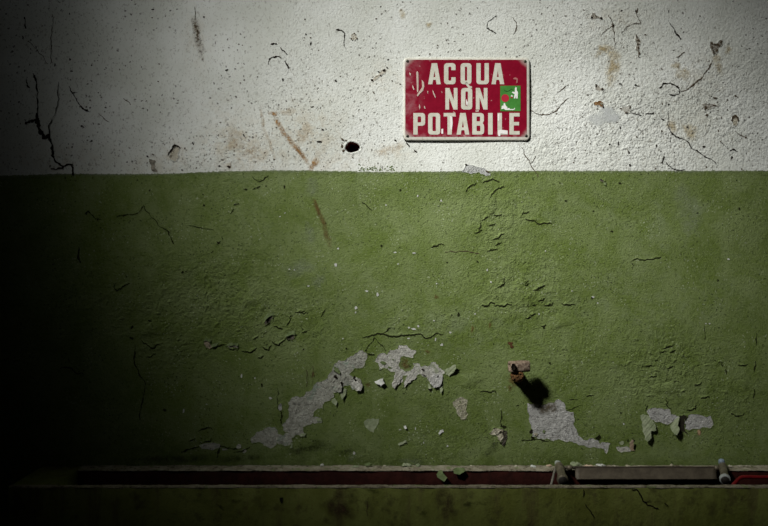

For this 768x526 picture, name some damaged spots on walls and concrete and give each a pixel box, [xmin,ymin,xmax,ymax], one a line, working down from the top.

crack [22,15,109,176]
crack [659,60,713,96]
crack [631,112,747,171]
spalling [460,164,491,177]
crack [431,177,504,254]
crack [521,210,552,225]
crack [481,278,575,327]
crack [363,326,444,355]
peeling [198,325,456,451]
peeling [452,396,468,421]
peeling [526,398,636,455]
peeling [640,407,714,442]